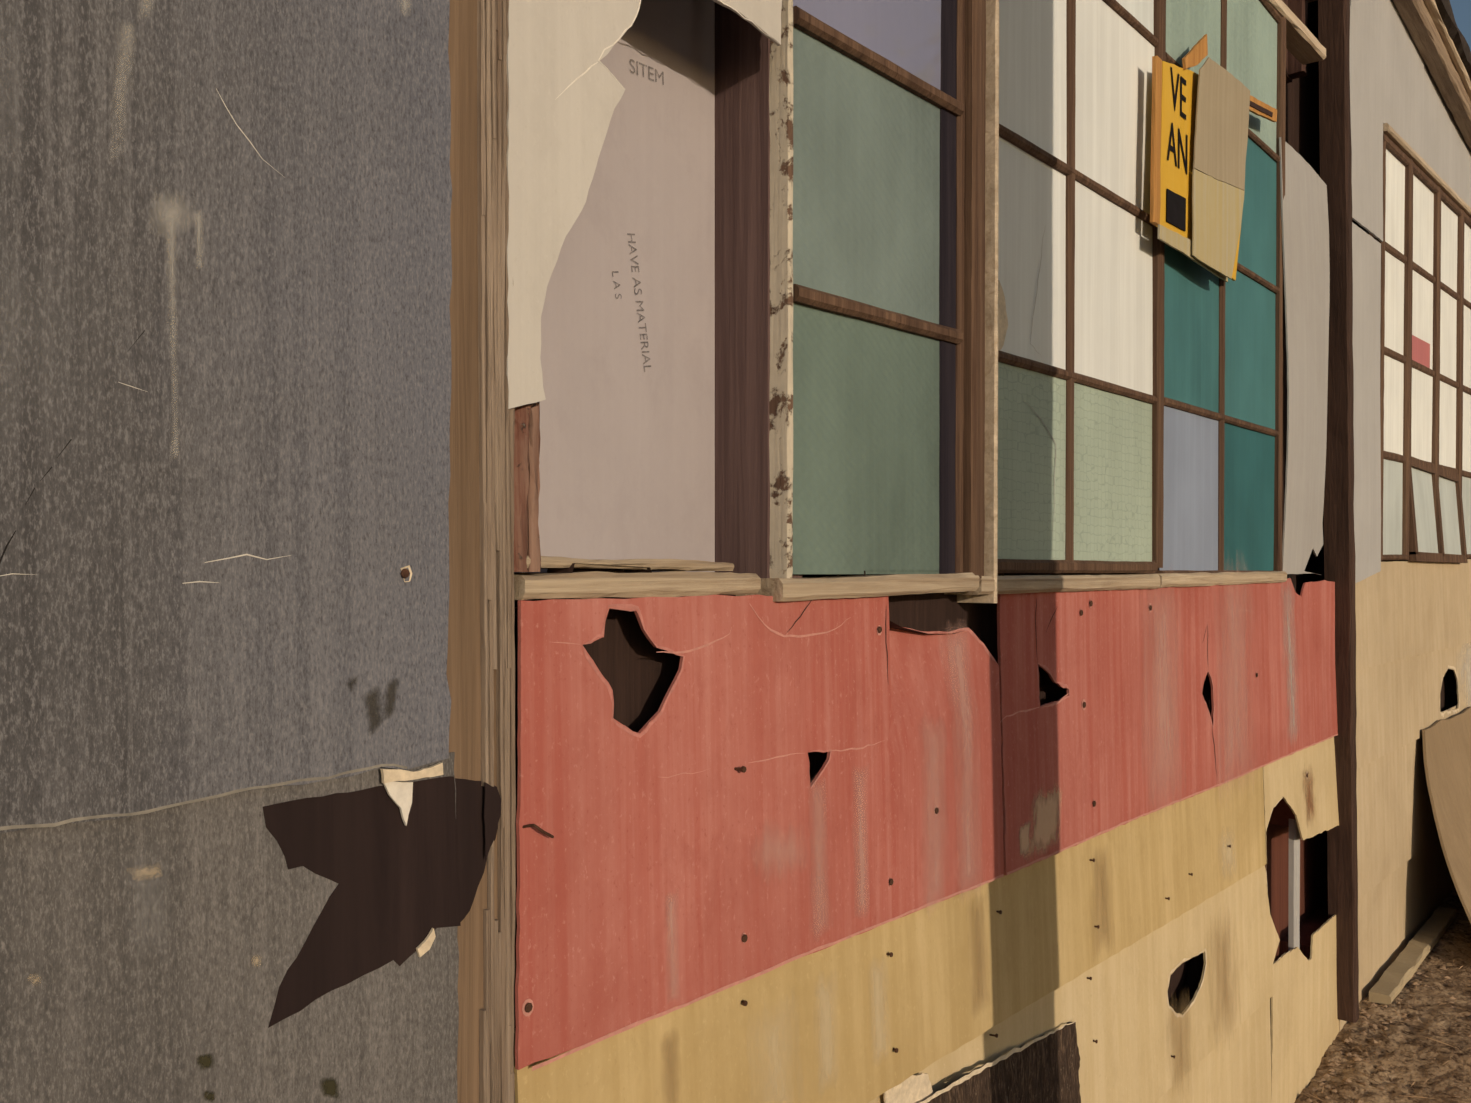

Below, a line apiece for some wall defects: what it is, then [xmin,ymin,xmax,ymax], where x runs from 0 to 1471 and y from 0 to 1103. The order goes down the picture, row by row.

spalling [598,0,641,89]
crack [749,740,885,763]
peeling [380,762,443,826]
peeling [416,928,436,957]
spalling [883,1020,1081,1103]